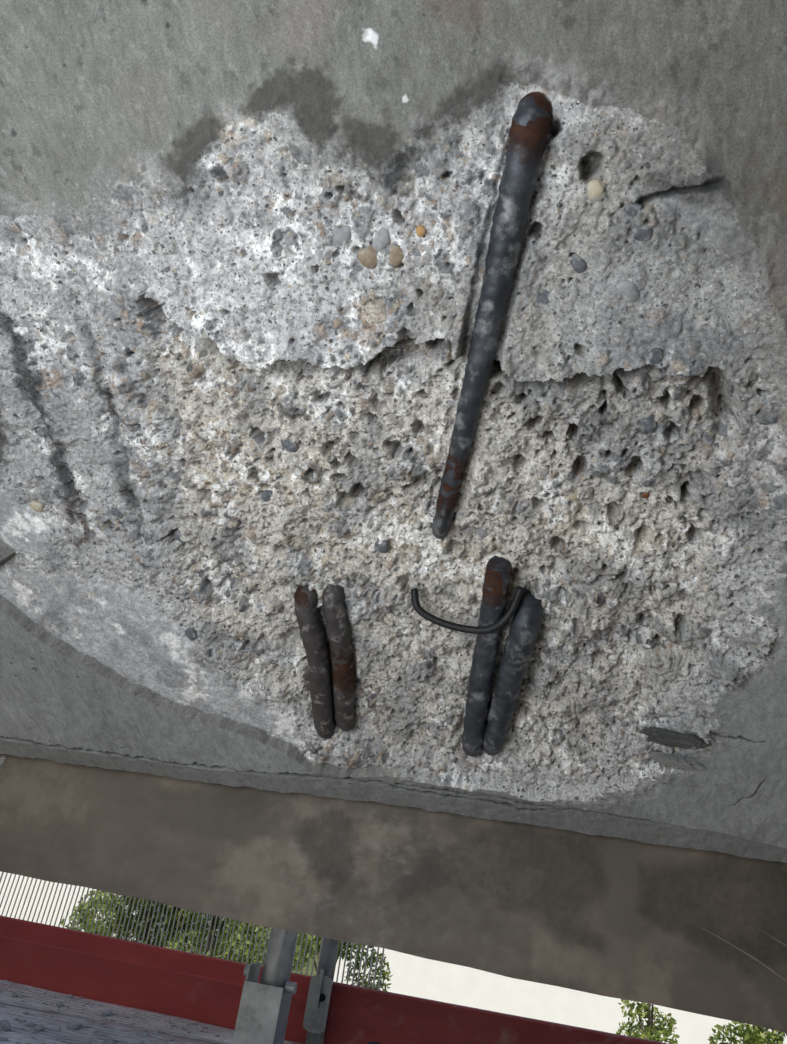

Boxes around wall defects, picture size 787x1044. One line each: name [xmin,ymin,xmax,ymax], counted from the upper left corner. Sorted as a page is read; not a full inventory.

leakage [168,117,223,181]
leakage [243,59,402,178]
leakage [415,61,513,137]
corrosion [507,92,553,151]
crack [635,175,730,210]
spalling [0,81,787,803]
corrosion [437,453,469,511]
crack [778,541,787,553]
corrosion [294,586,318,605]
corrosion [482,566,512,605]
corrosion [331,652,355,691]